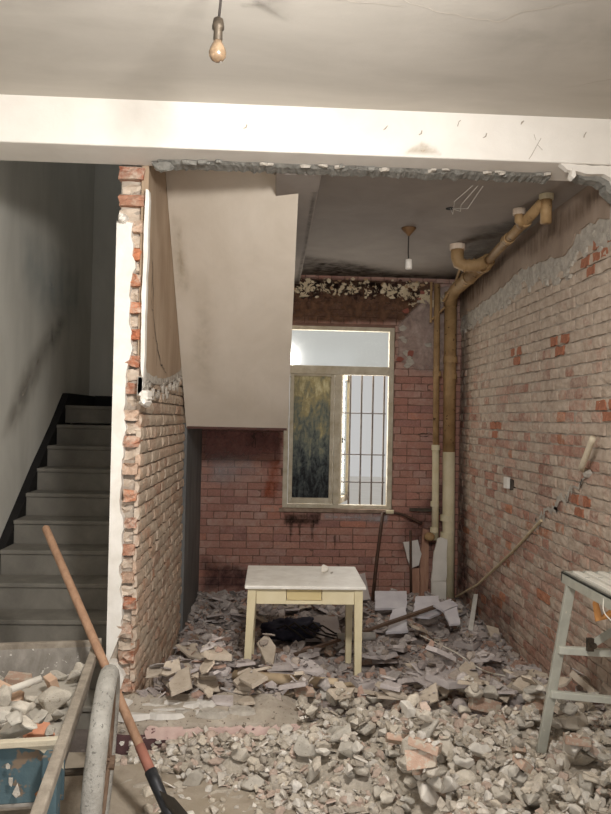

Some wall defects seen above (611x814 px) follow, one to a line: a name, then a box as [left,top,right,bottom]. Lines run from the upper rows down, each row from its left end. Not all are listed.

spalling [151,159,551,185]
spalling [456,204,611,334]
peeling [292,277,454,370]
spalling [550,334,570,357]
peeling [106,189,182,692]
spalling [571,494,591,518]
leakage [285,515,319,536]